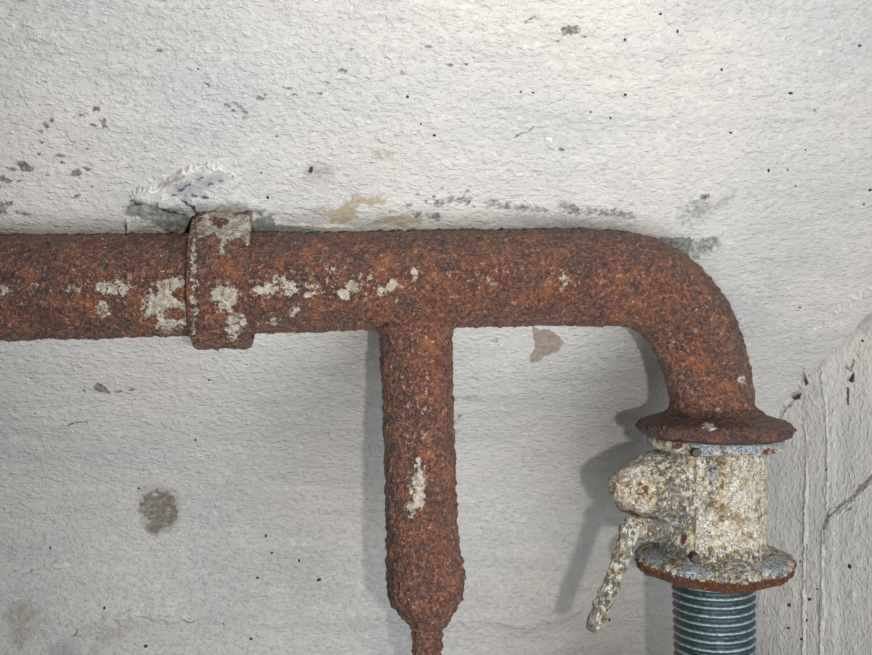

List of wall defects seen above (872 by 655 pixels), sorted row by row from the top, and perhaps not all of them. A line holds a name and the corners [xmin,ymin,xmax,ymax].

flaking render [125,177,223,235]
leakage [141,490,178,533]
crack [822,475,872,538]